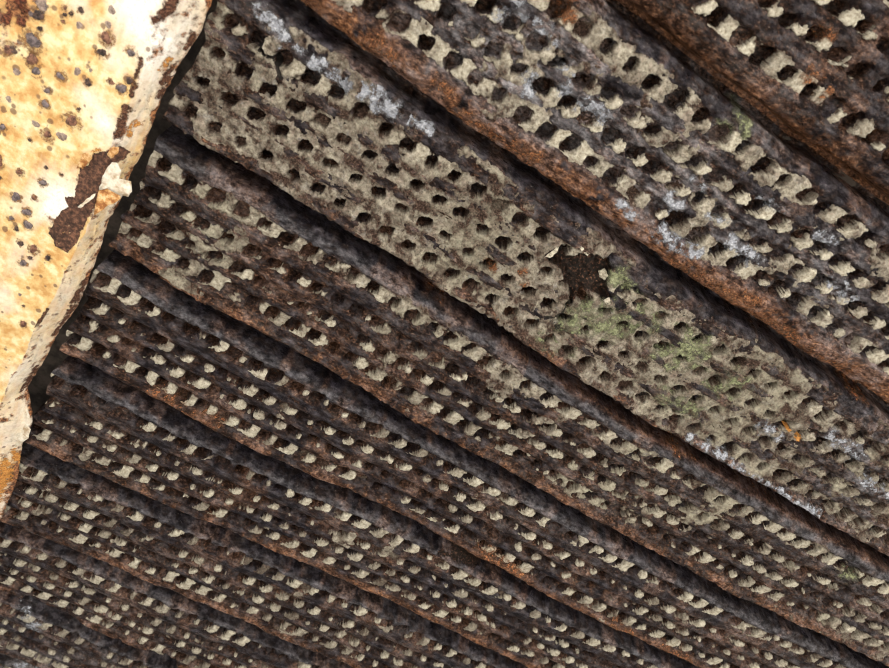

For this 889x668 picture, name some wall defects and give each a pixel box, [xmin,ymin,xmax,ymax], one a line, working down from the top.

rust [0,0,52,109]
rust [60,5,84,29]
rust [54,67,93,87]
rust [95,5,116,59]
rust [106,46,144,140]
rust [155,56,174,99]
rust [151,0,179,25]
rust [28,107,83,145]
rust [6,165,52,267]
peeling [49,146,132,253]
rust [20,308,49,328]
rust [51,279,89,336]